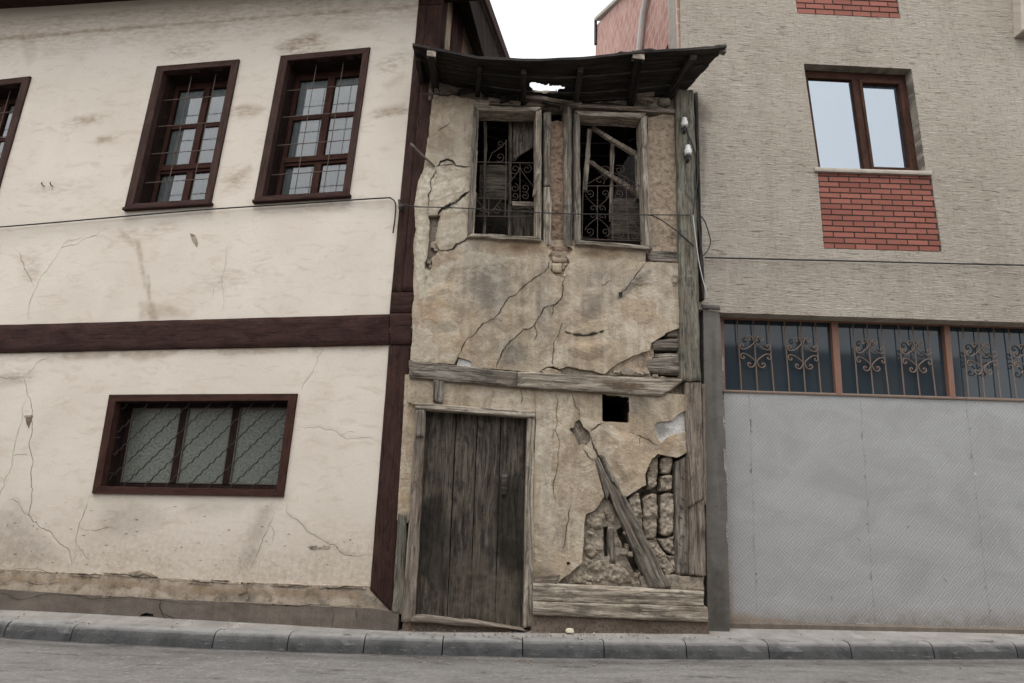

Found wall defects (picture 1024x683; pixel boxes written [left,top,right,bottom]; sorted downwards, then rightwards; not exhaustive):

crack [427,158,470,217]
crack [439,237,467,251]
crack [455,257,604,367]
flaking render [541,329,680,379]
crack [0,359,389,622]
crack [551,392,621,548]
flaking render [534,412,704,592]